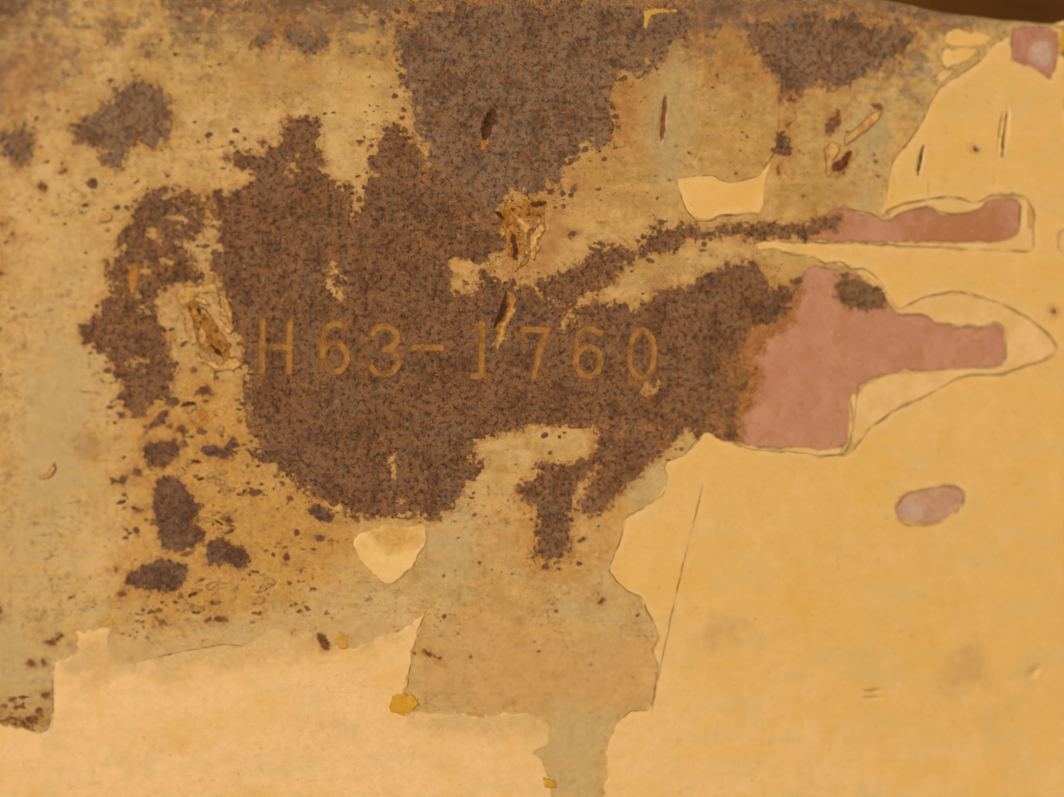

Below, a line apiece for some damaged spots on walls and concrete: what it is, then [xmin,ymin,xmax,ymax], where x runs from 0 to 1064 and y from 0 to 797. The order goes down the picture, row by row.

rust [0,120,43,172]
peeling [677,121,779,221]
peeling [886,21,1064,193]
peeling [798,195,1035,252]
rust [66,0,945,597]
peeling [707,259,1058,456]
peeling [353,524,427,584]
peeling [895,485,966,527]
rust [205,600,228,626]
crack [609,494,663,721]